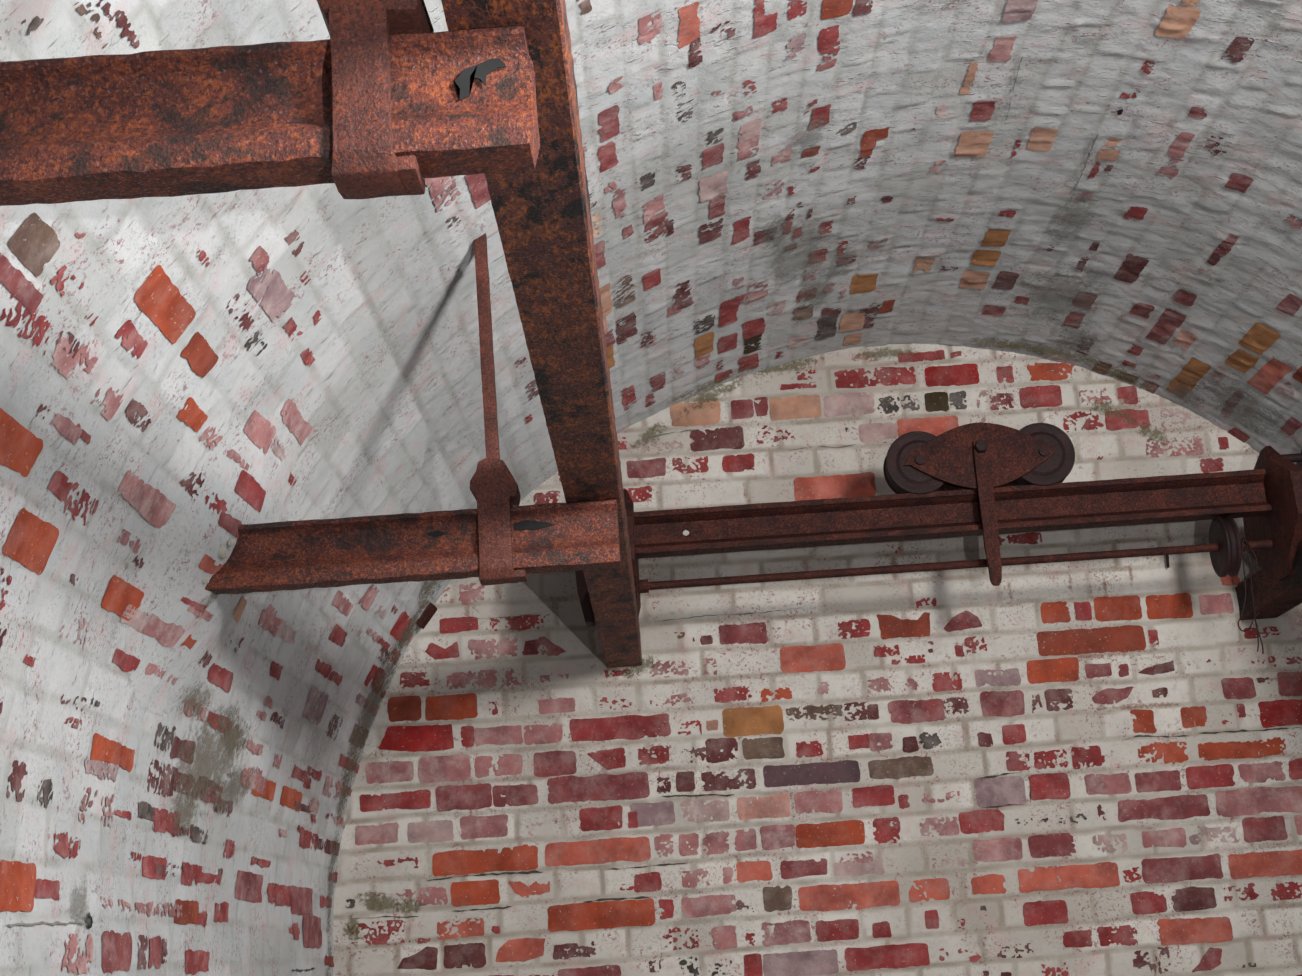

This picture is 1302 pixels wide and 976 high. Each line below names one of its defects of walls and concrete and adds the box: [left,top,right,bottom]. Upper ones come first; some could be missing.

peeling [753,0,873,71]
peeling [0,213,98,379]
peeling [115,265,219,377]
peeling [227,246,322,367]
peeling [618,80,1302,502]
peeling [0,404,91,477]
peeling [0,471,99,649]
peeling [177,397,266,622]
peeling [101,575,233,693]
damp [179,684,211,716]
peeling [0,859,60,912]
peeling [100,839,355,967]